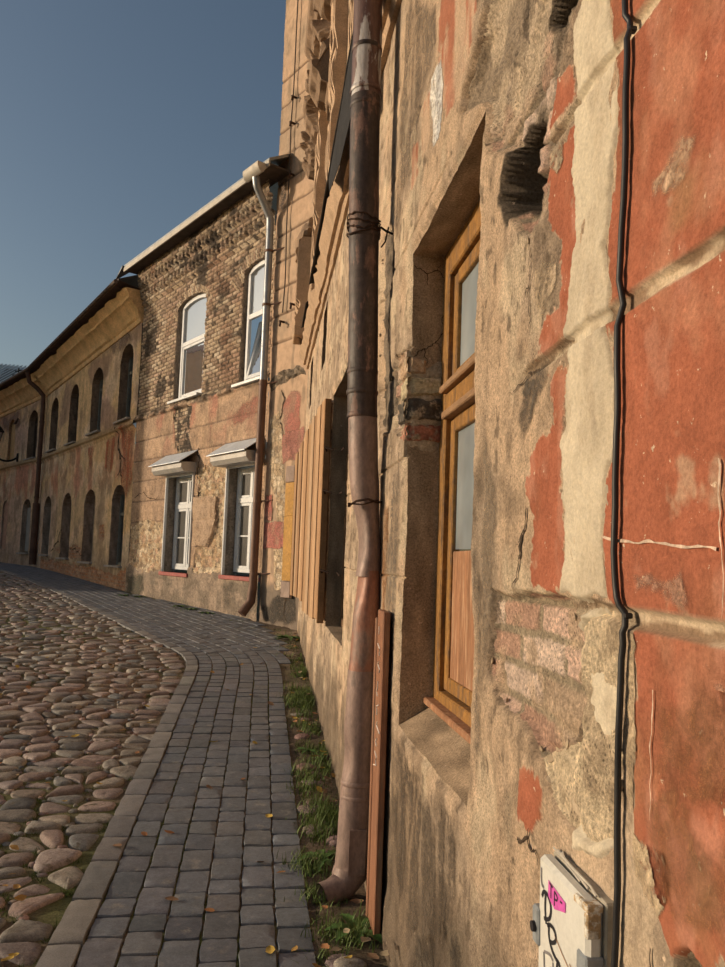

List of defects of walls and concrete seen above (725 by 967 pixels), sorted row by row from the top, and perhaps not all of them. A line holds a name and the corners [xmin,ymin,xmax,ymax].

spalling [467,0,579,244]
spalling [173,405,193,453]
spalling [263,365,306,591]
spalling [491,593,636,857]
water stain [394,747,459,967]
peeling [633,833,666,917]
spalling [684,951,702,967]